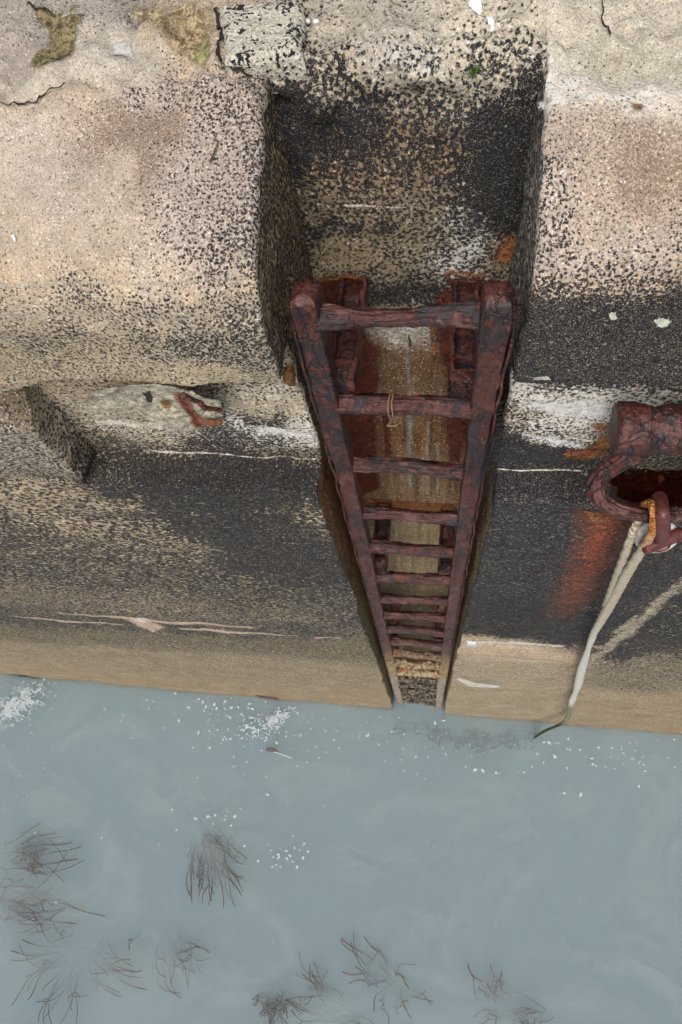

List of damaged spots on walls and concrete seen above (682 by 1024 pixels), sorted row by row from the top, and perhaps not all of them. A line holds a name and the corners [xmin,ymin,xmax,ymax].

crack [0,82,66,105]
corrosion [494,235,517,263]
water stain [525,398,610,420]
water stain [95,418,191,430]
water stain [251,425,317,438]
water stain [519,432,585,448]
corrosion [563,423,610,460]
corrosion [567,511,624,603]
water stain [463,640,565,663]